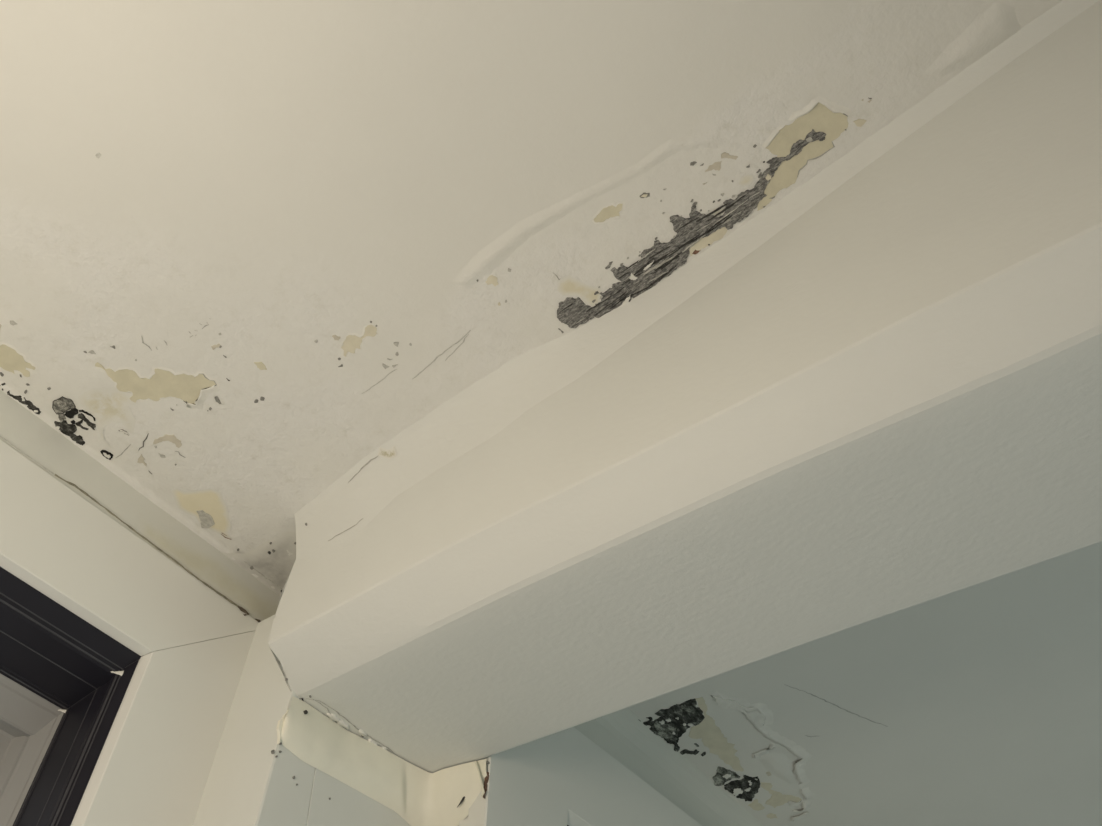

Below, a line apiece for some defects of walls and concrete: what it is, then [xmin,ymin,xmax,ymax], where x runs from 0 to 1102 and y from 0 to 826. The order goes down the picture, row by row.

flaking render [556,96,867,333]
peeling [0,342,230,474]
flaking render [638,697,802,819]